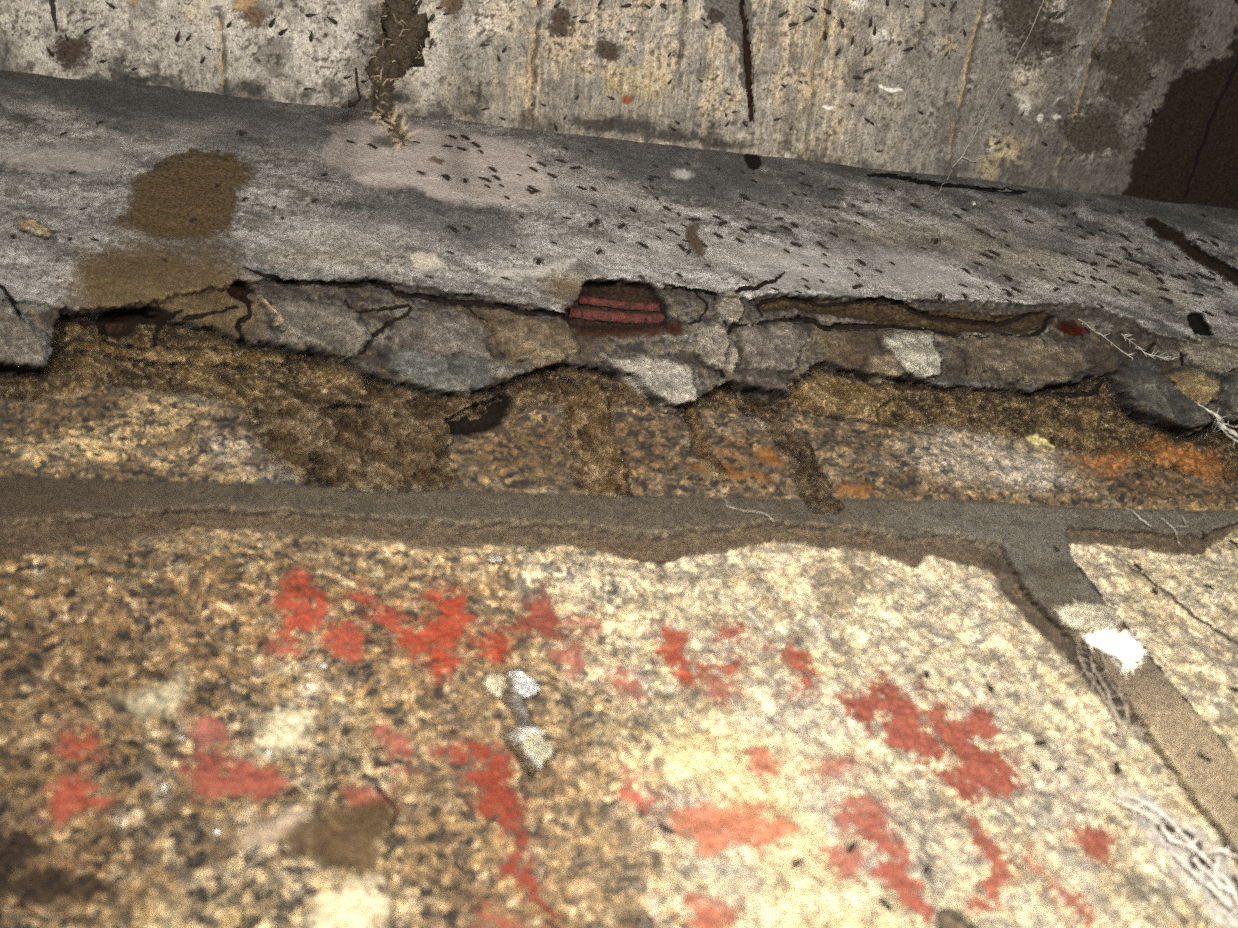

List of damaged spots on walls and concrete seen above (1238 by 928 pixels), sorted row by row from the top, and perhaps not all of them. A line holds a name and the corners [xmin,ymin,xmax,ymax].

crack [738,0,755,122]
leakage [978,0,1077,77]
leakage [1051,0,1238,210]
leakage [4,147,113,171]
leakage [119,148,254,241]
leakage [1145,218,1238,286]
spalling [564,280,666,330]